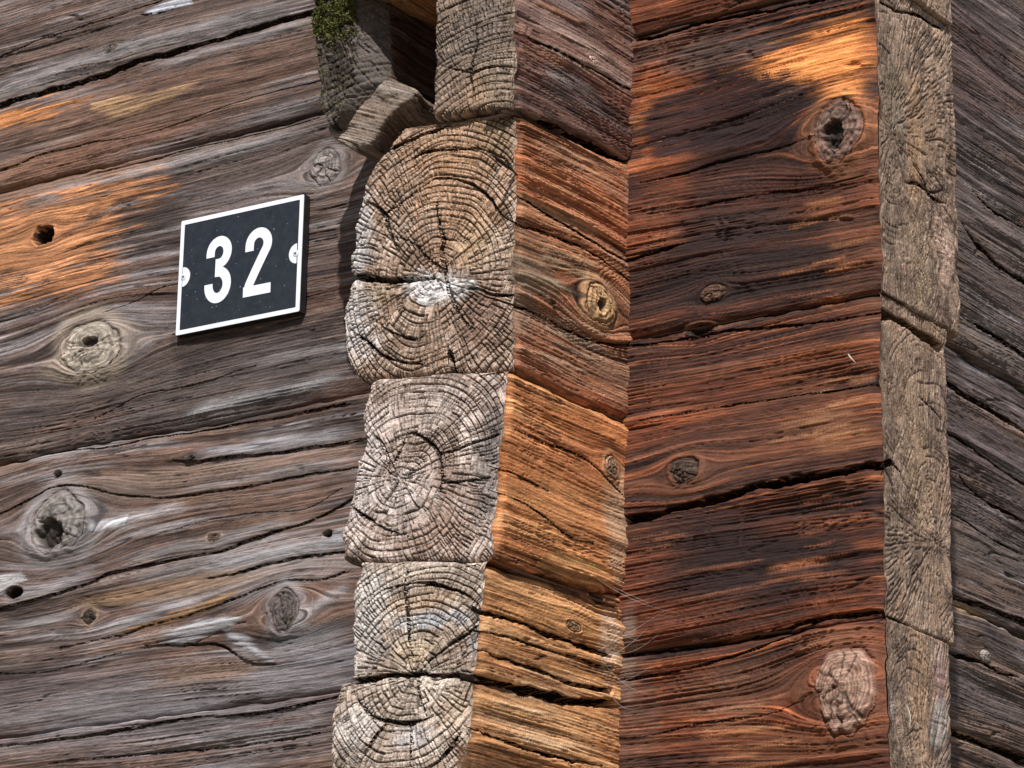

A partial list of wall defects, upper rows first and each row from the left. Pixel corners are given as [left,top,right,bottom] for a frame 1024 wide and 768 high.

crack [0,0,174,57]
crack [0,10,314,109]
crack [356,126,945,347]
crack [0,403,902,674]
crack [3,567,895,768]